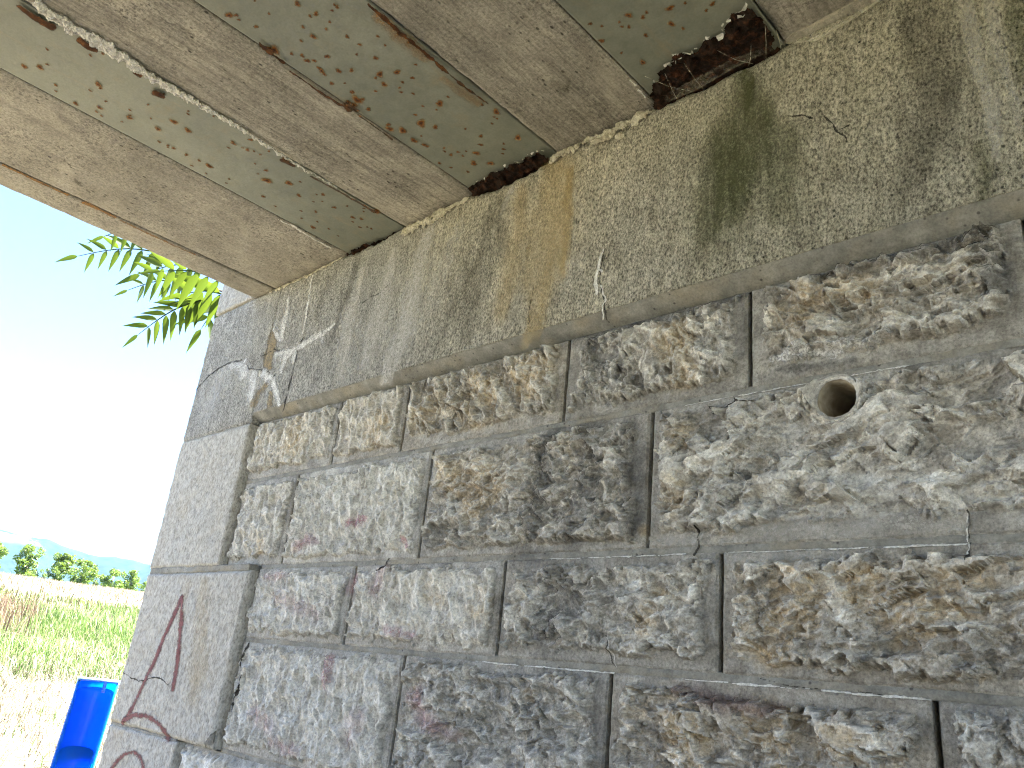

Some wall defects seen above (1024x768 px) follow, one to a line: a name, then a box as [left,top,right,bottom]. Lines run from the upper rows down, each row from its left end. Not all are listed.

corrosion [16,5,56,31]
corrosion [76,37,104,57]
water stain [32,0,337,189]
corrosion [259,1,500,147]
corrosion [147,90,213,174]
crack [789,113,850,143]
corrosion [2,164,69,196]
corrosion [82,201,196,255]
corrosion [285,176,380,237]
corrosion [346,232,396,256]
crack [593,249,610,323]
crack [196,338,303,410]